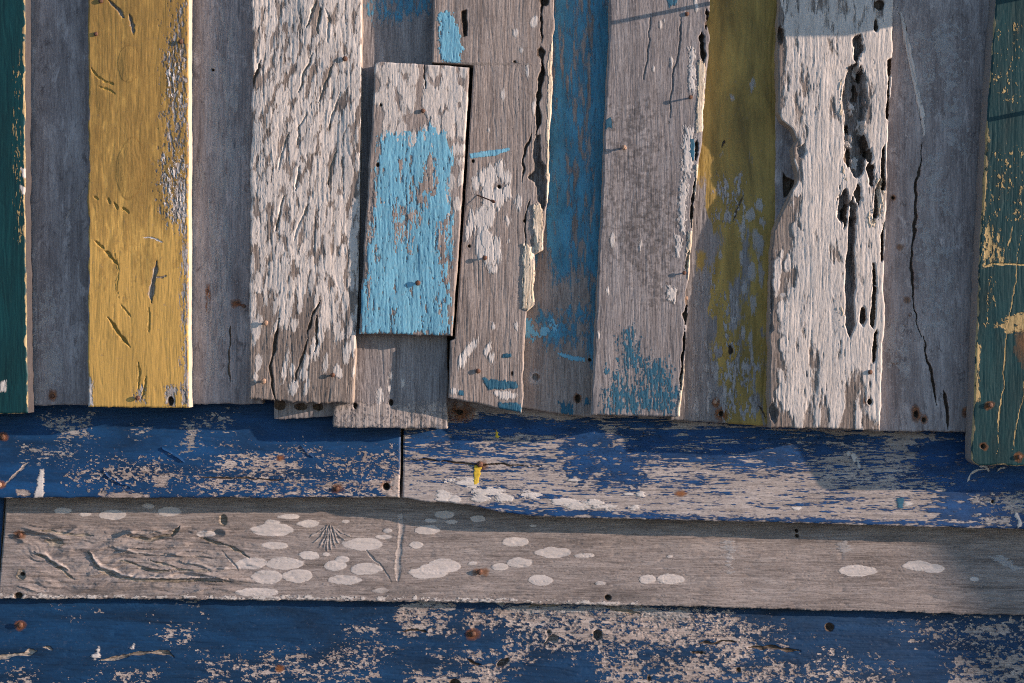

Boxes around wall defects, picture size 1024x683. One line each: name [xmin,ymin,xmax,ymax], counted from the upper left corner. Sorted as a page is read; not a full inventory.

crack [521,6,545,243]
crack [113,255,121,298]
peeling [16,0,1024,529]
crack [909,113,949,429]
spalling [35,529,93,579]
spalling [127,526,180,542]
spalling [200,537,247,557]
peeling [0,552,910,683]
peeling [890,613,1024,683]